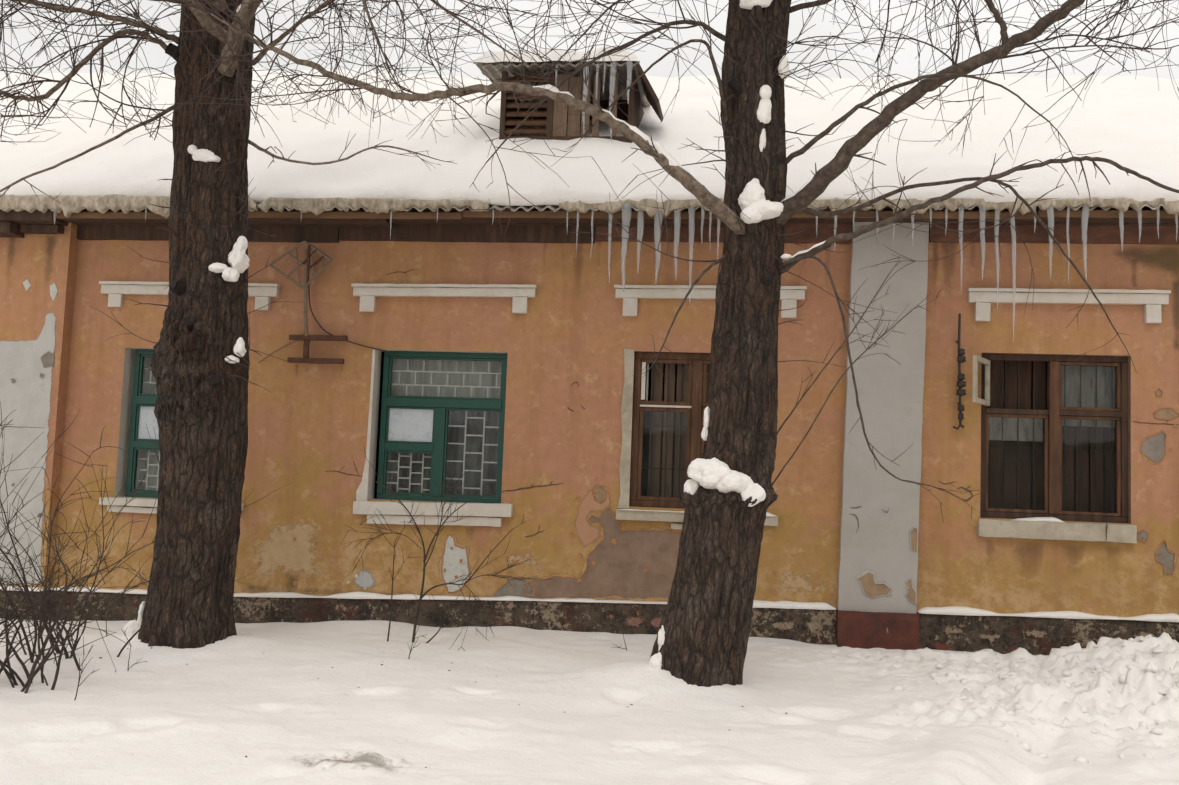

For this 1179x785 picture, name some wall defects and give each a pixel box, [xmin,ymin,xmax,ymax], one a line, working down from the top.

peeling [0,283,57,585]
spalling [1140,388,1179,465]
peeling [347,570,375,589]
peeling [438,534,471,593]
spalling [856,570,917,605]
spalling [1137,529,1177,575]